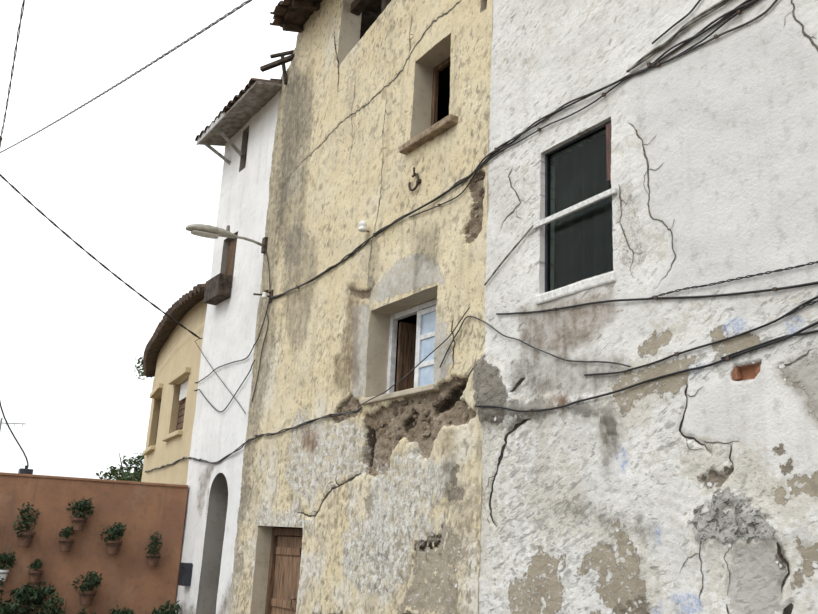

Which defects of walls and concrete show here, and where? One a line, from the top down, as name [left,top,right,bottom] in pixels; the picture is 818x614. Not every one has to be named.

crack [783,0,818,51]
crack [284,0,461,301]
flaking render [465,171,485,244]
crack [618,123,676,289]
flaking render [612,330,697,417]
flaking render [710,324,761,381]
crack [296,473,361,517]
flaking render [285,377,477,614]
crack [487,418,532,525]
crack [679,384,740,473]
flaking render [508,545,566,614]
flaking render [577,519,650,614]